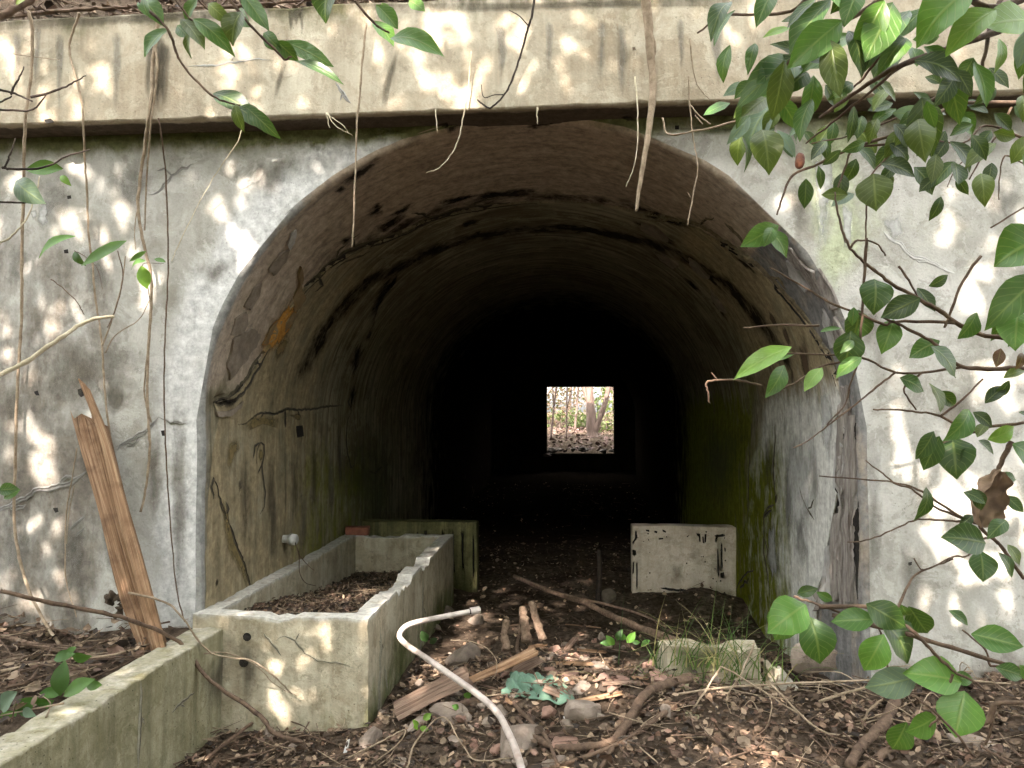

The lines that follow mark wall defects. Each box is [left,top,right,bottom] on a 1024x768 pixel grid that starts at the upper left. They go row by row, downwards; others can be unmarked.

crack [149,164,193,195]
crack [304,199,537,294]
flaking render [226,283,262,381]
corrosion [262,266,306,358]
crack [215,349,342,514]
crack [210,477,251,586]
crack [736,423,859,601]
crack [264,634,352,668]